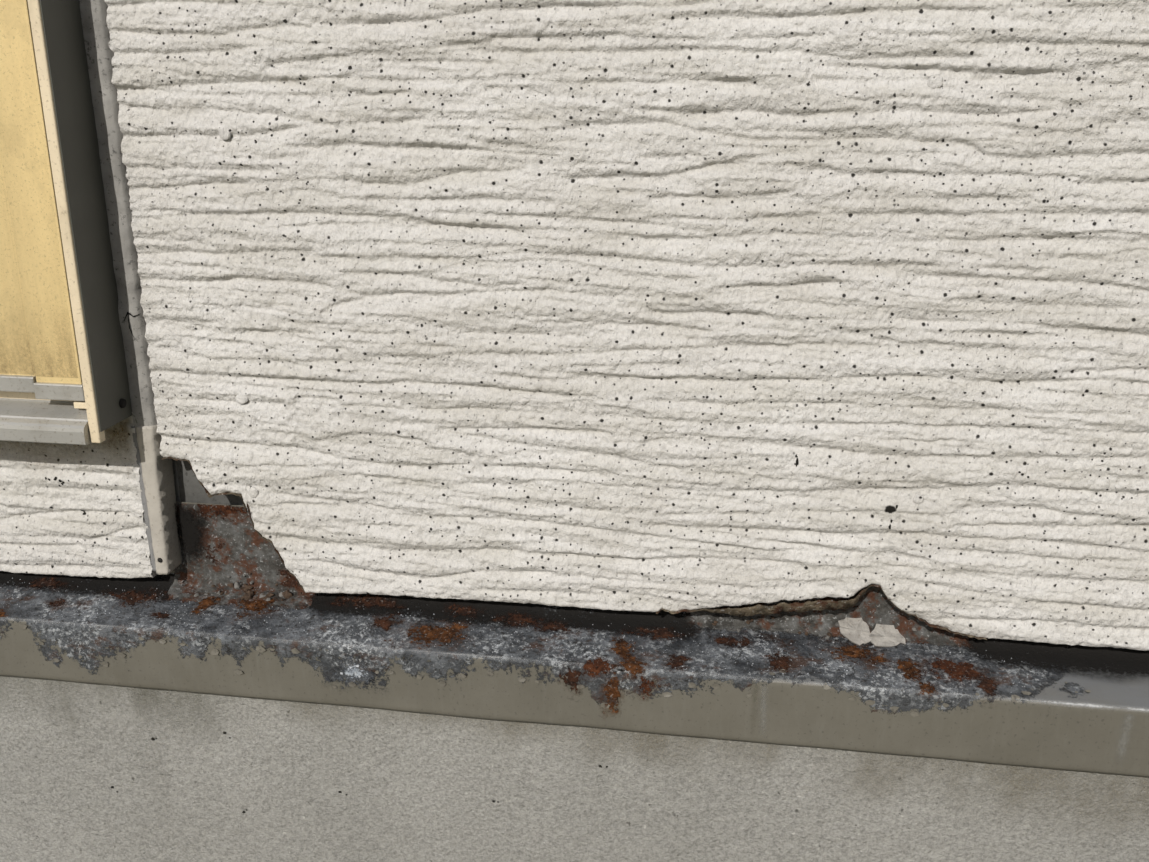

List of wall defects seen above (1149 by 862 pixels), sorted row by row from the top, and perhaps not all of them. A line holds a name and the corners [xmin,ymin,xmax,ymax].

rust [192,504,247,521]
rust [103,589,174,620]
rust [192,567,298,620]
rust [326,649,376,691]
rust [331,594,477,651]
rust [492,611,573,634]
peeling [0,457,1091,717]
rust [559,627,685,714]
rust [664,654,693,671]
rust [714,635,750,648]
rust [764,651,792,672]
rust [819,640,999,697]